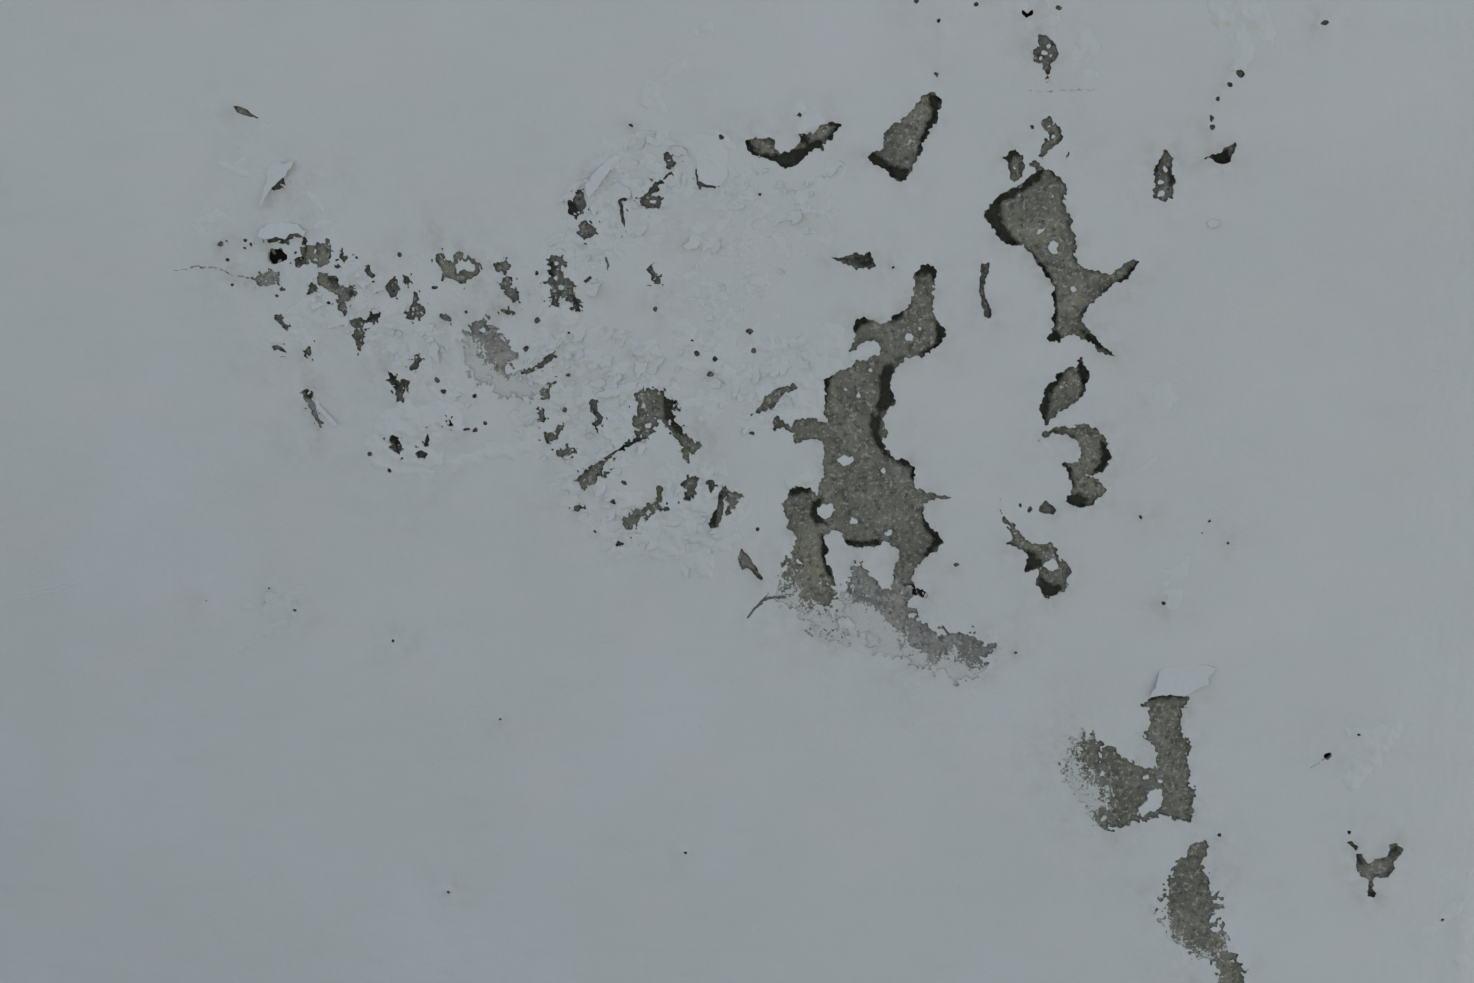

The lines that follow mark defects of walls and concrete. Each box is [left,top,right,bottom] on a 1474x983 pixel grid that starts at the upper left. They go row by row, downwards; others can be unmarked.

spalling [234,106,258,118]
peeling [745,113,842,169]
peeling [868,72,942,182]
peeling [217,124,997,687]
peeling [984,116,1139,599]
peeling [1059,664,1216,832]
peeling [1154,833,1249,983]
peeling [1347,831,1404,898]